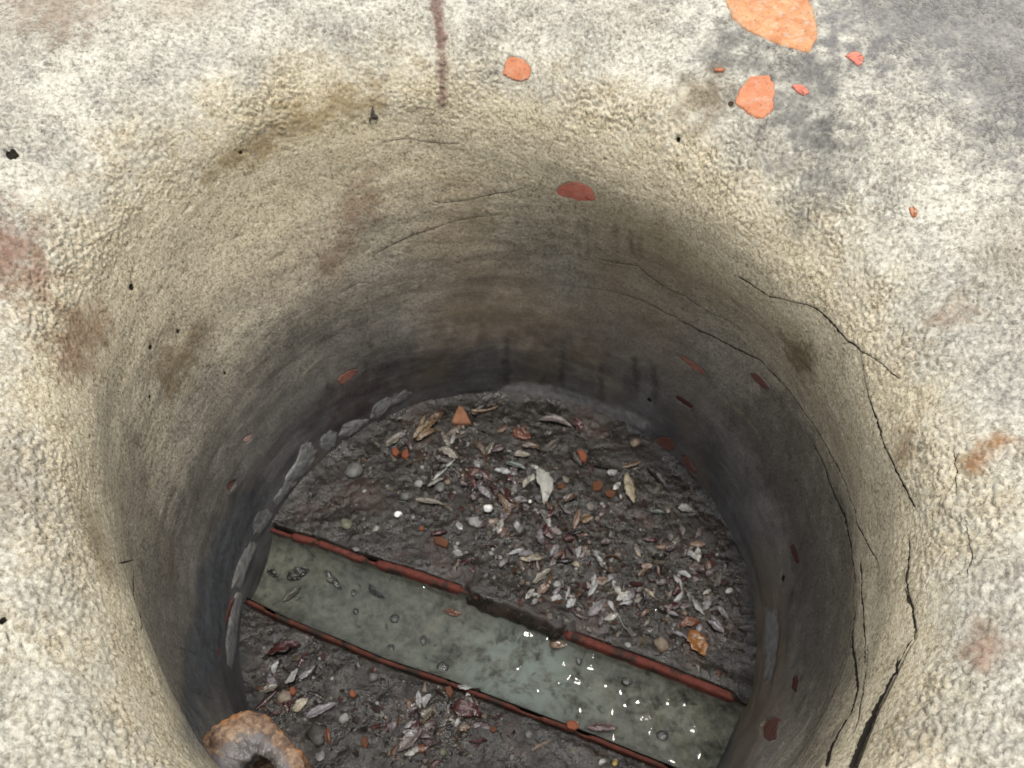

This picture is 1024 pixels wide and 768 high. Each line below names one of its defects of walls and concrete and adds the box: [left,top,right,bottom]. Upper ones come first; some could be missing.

rust [434,0,444,47]
crack [584,258,917,768]